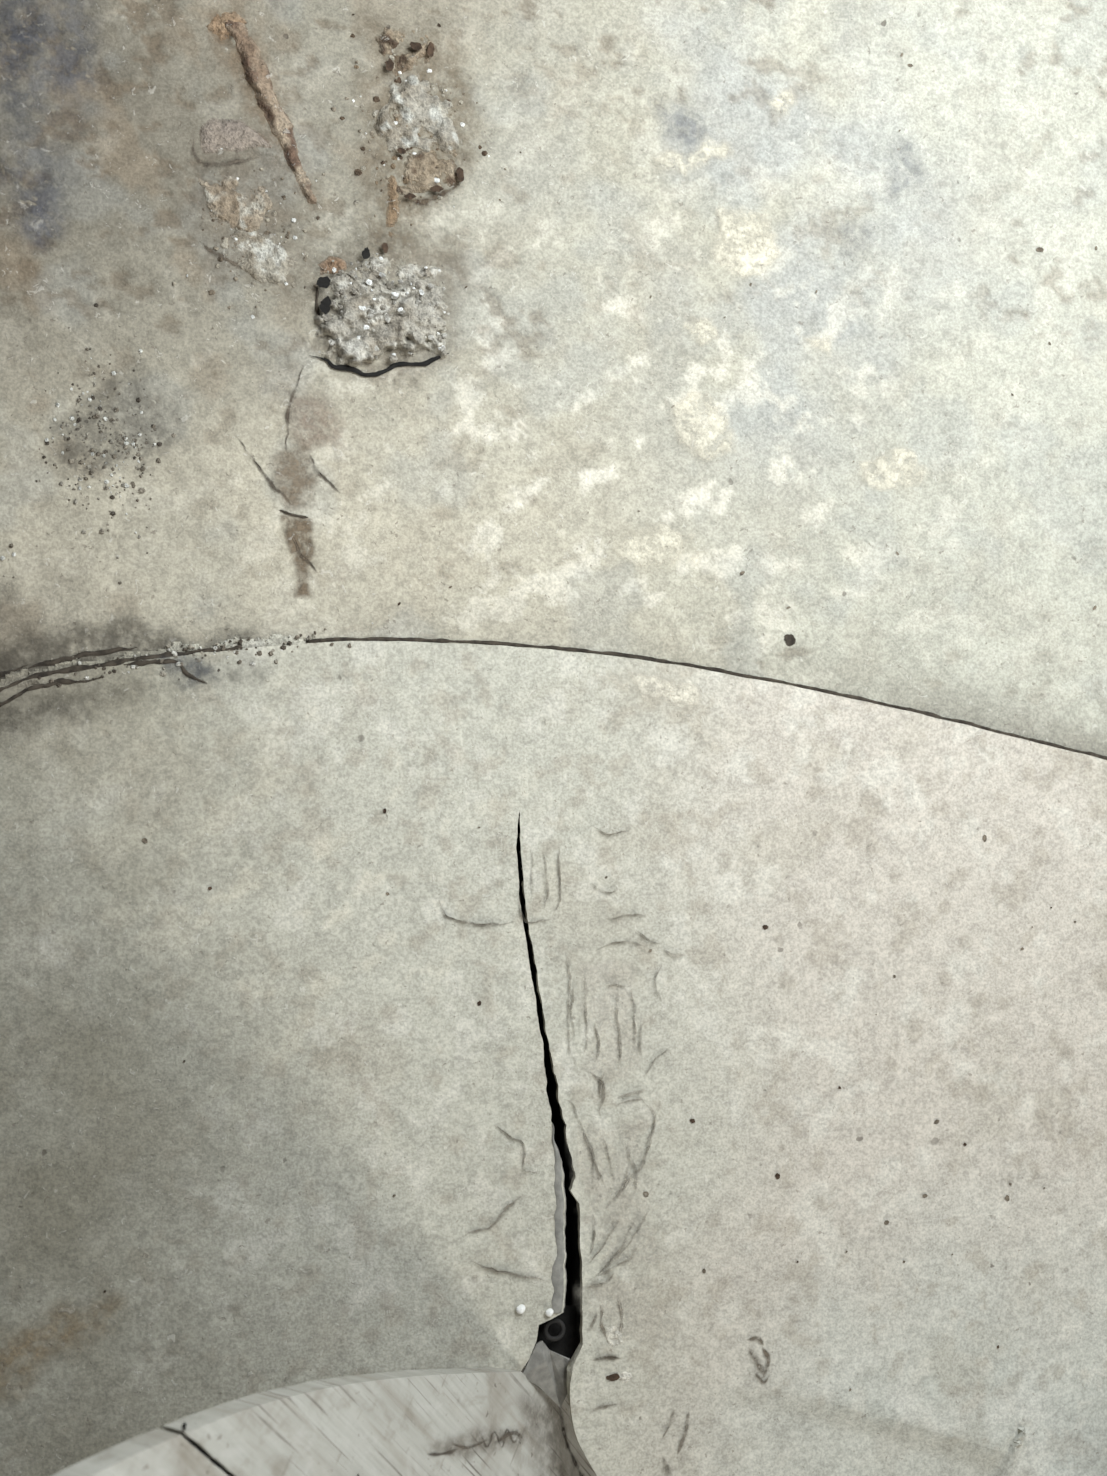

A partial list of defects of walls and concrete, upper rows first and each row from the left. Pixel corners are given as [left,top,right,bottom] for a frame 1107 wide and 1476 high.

corrosion [206,11,317,204]
spalling [331,23,490,253]
leakage [276,453,314,595]
crack [0,622,1107,760]
crack [444,814,581,1340]
crack [181,1422,233,1476]